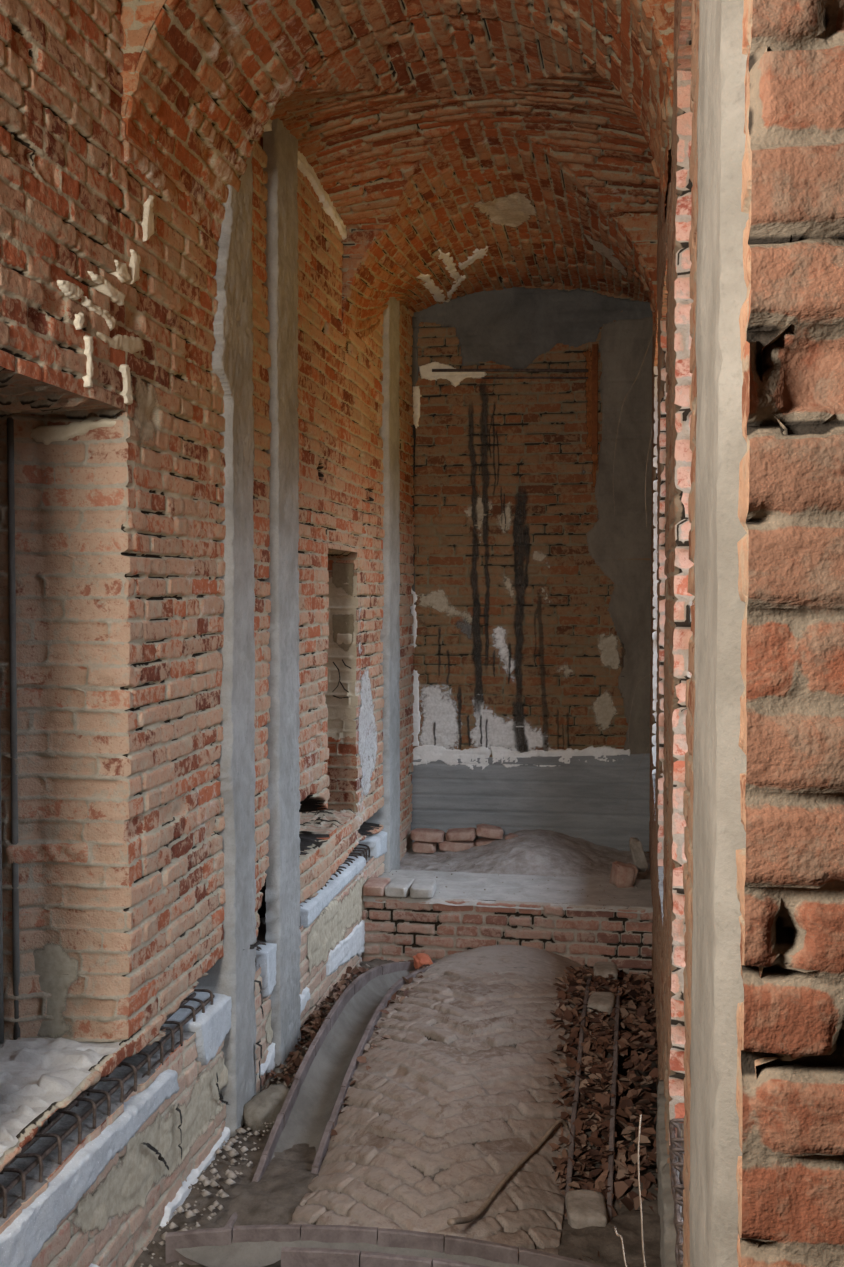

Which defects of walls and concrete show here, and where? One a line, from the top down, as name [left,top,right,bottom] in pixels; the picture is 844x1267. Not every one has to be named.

leakage [418,383,573,753]
flaking render [410,589,418,648]
leakage [598,634,626,677]
flaking render [412,670,630,770]
leakage [592,690,622,730]
flaking render [74,1057,230,1234]